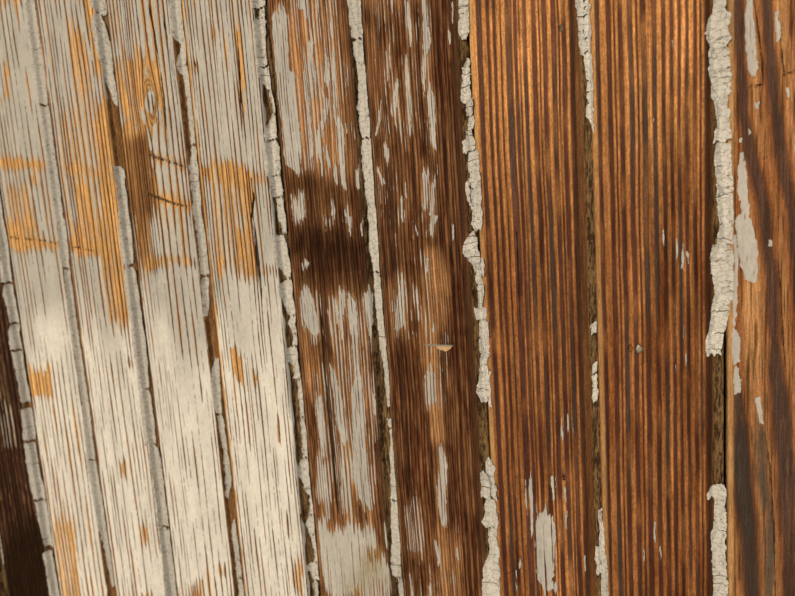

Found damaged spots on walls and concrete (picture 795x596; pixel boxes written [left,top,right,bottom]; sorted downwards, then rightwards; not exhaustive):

peeling [448,0,470,45]
peeling [575,0,595,133]
peeling [0,0,456,596]
peeling [460,58,492,407]
peeling [705,0,759,395]
peeling [755,396,764,424]
peeling [480,457,508,596]
peeling [525,470,567,596]
peeling [584,508,609,596]
peeling [707,483,729,596]